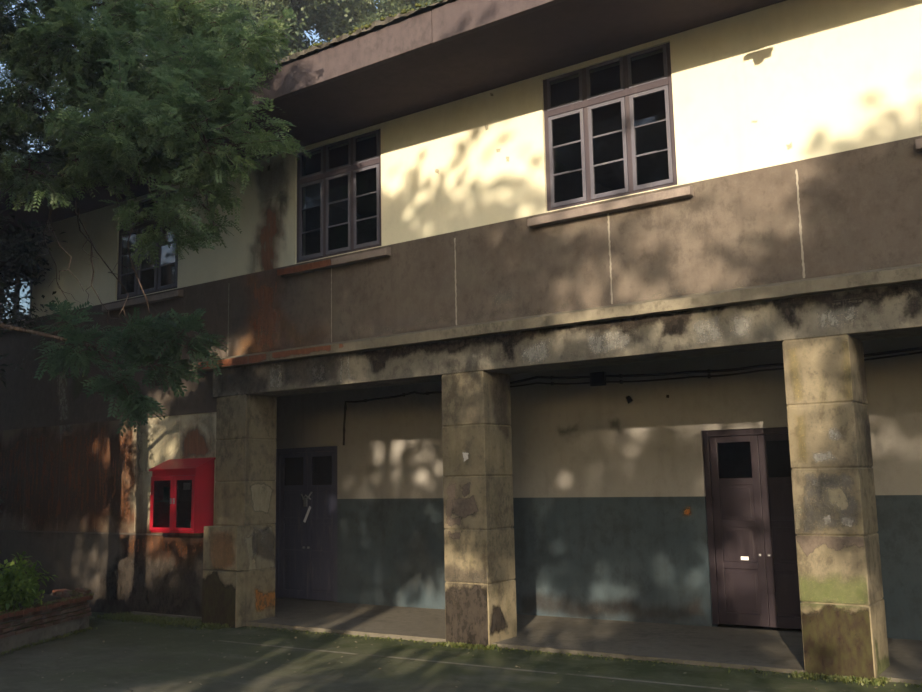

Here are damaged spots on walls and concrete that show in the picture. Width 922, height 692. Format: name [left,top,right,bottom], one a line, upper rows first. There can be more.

damp [225,306,726,391]
damp [734,282,922,337]
corrosion [182,427,210,459]
damp [97,527,204,615]
damp [445,568,508,646]
damp [802,604,879,680]